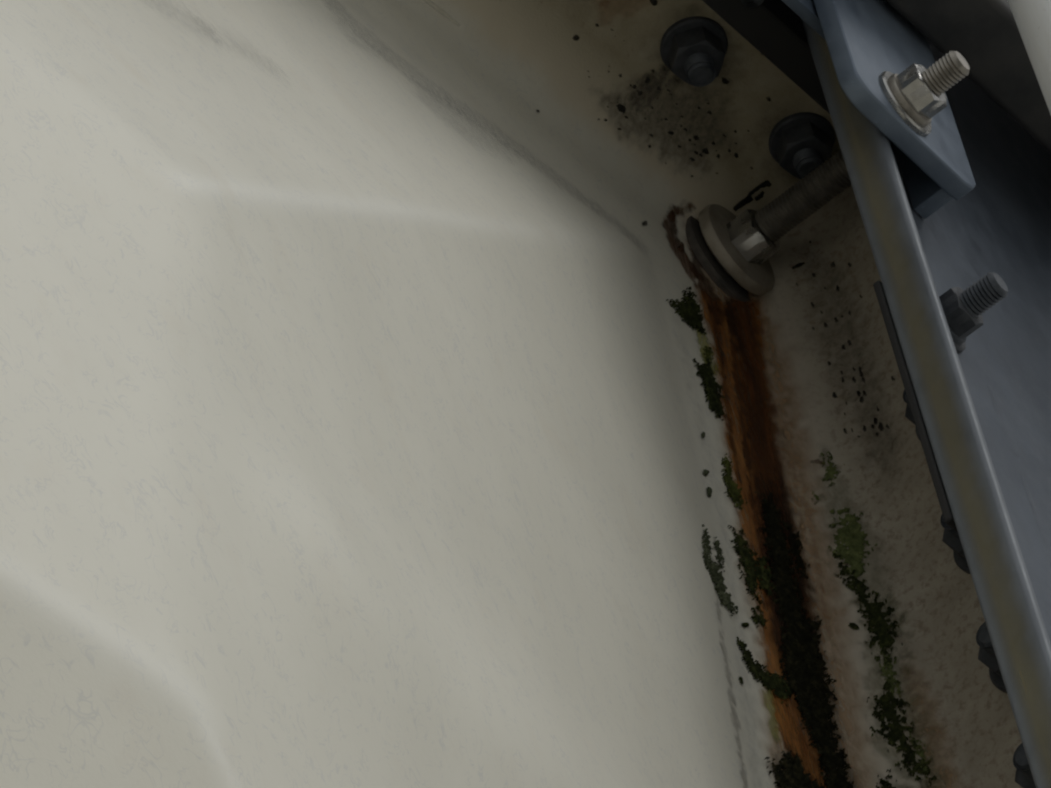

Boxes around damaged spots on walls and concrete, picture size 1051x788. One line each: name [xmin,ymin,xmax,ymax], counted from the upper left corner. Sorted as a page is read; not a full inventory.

damp [598,66,750,164]
corrosion [663,204,863,788]
damp [820,36,1051,780]